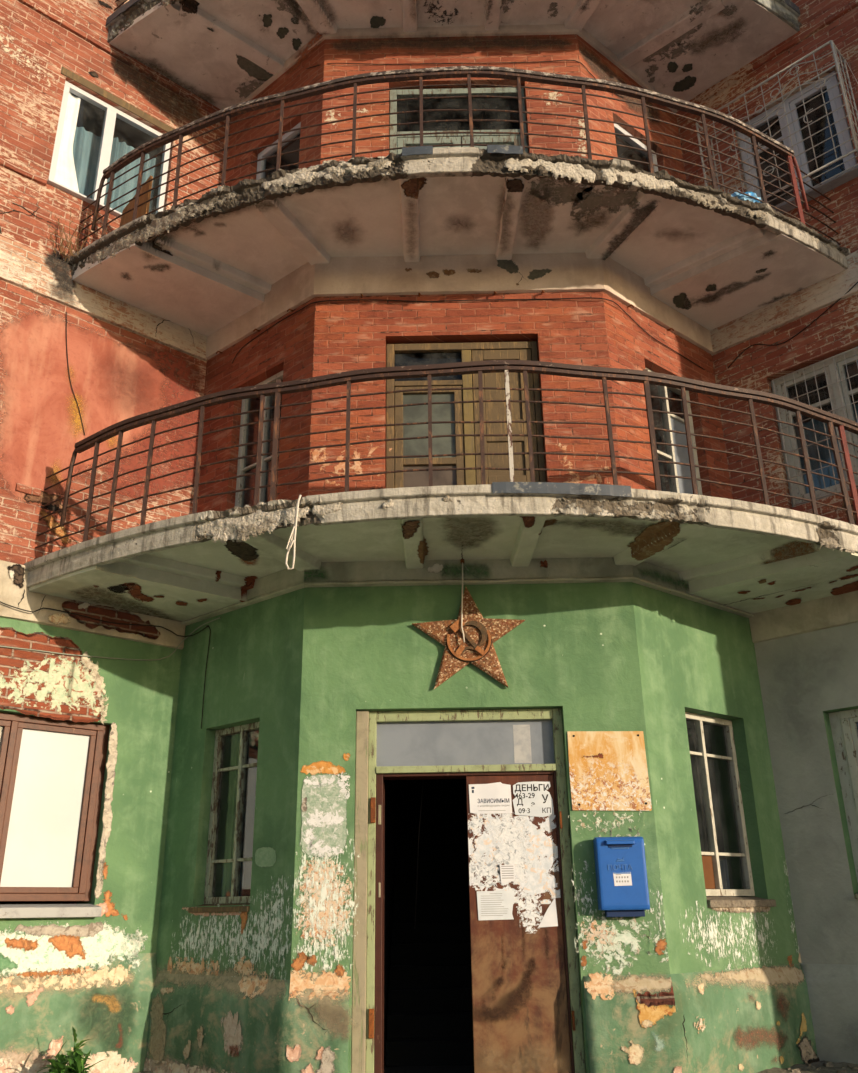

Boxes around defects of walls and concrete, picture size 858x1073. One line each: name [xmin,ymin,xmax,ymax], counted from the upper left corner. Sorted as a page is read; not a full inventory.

water stain [643,2,744,63]
water stain [580,48,659,122]
spalling [261,156,395,189]
spalling [504,110,796,232]
rust [738,579,812,606]
rust [764,541,816,564]
rust [830,566,858,595]
flaking render [0,600,161,899]
peeling [0,921,148,1015]
peeling [144,831,360,1073]
peeling [571,859,676,1028]
peeling [679,856,820,1064]